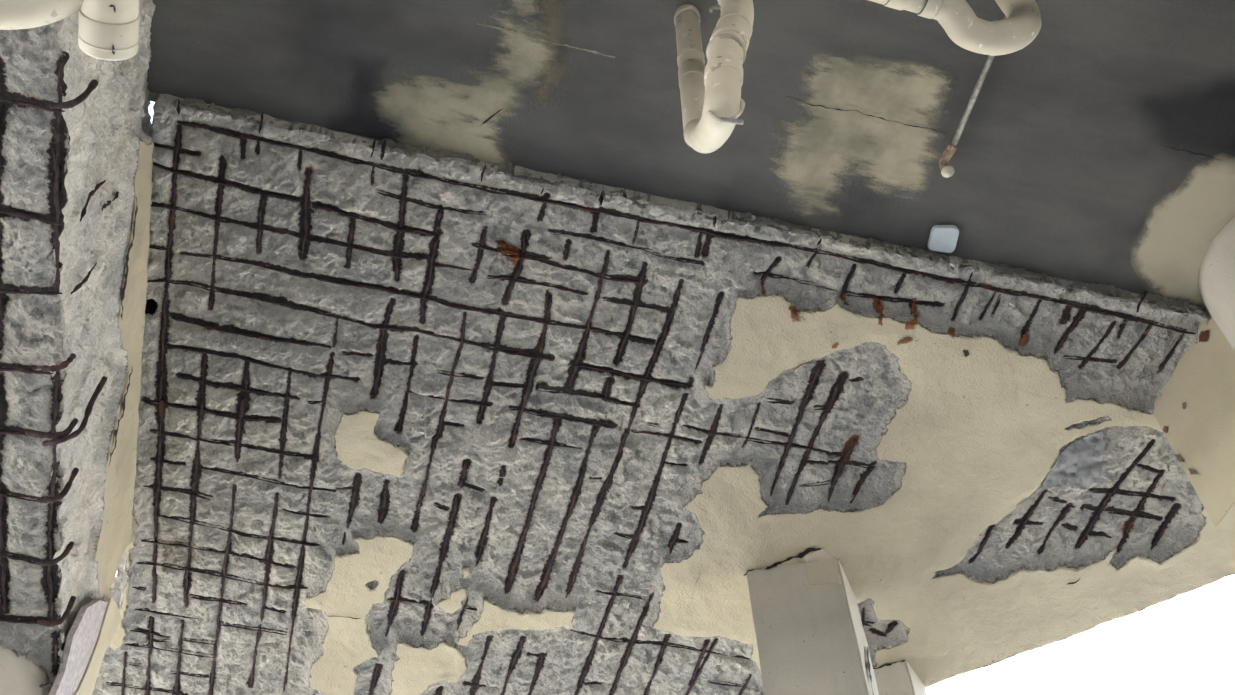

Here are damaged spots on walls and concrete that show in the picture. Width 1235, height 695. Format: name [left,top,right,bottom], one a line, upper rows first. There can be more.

peeling [372,19,555,164]
peeling [774,55,949,216]
spalling [0,0,156,695]
rust [496,240,521,265]
spalling [92,94,1211,695]
rust [789,306,800,322]
rust [872,296,884,325]
rust [898,298,919,344]